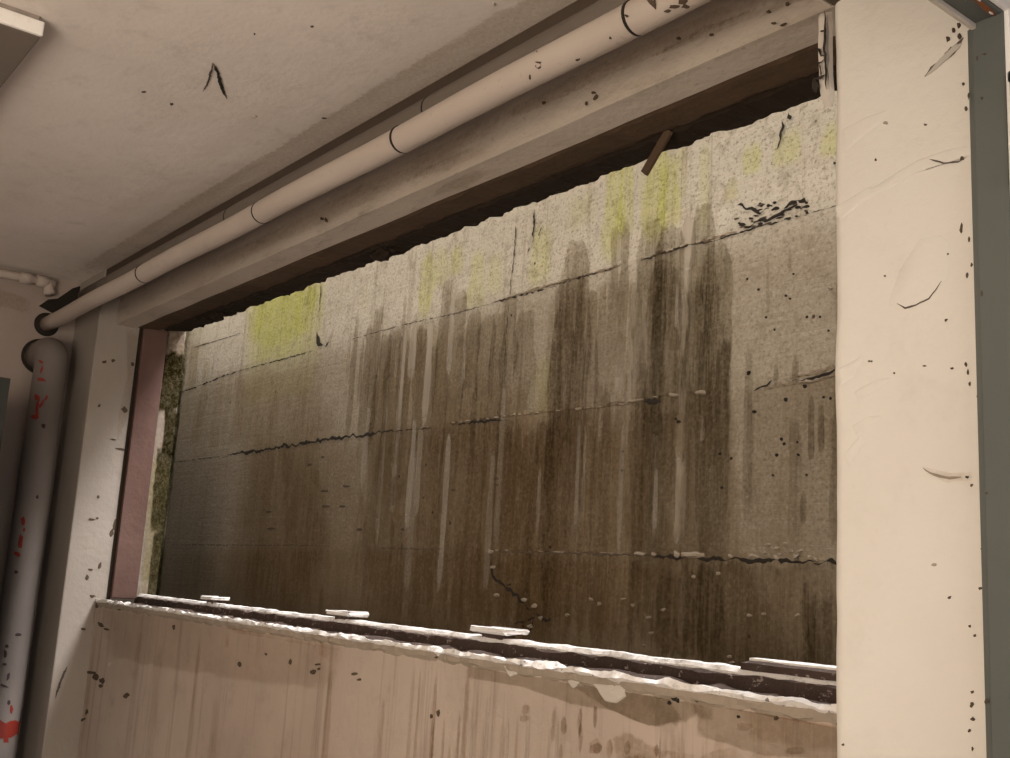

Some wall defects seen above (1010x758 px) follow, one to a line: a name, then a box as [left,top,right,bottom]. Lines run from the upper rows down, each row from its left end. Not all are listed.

crack [925,23,963,77]
crack [203,63,227,99]
spalling [734,198,810,228]
spalling [754,364,835,402]
crack [178,390,711,462]
crack [487,542,837,631]